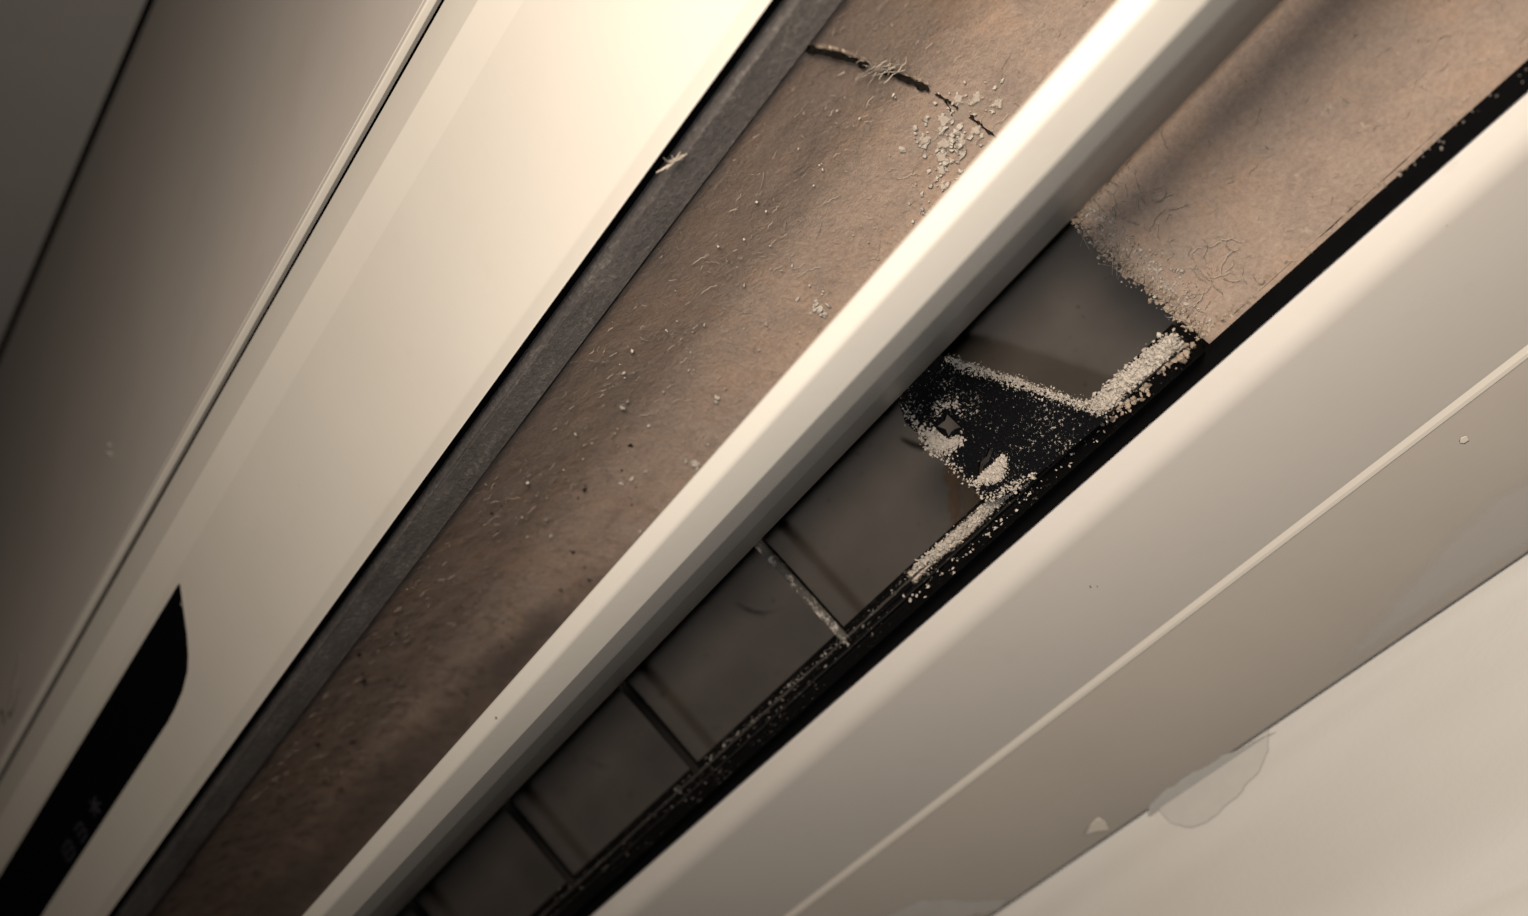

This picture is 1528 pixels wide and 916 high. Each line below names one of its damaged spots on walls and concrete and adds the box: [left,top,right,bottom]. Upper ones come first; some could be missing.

crack [804,44,996,137]
peeling [941,136,1444,443]